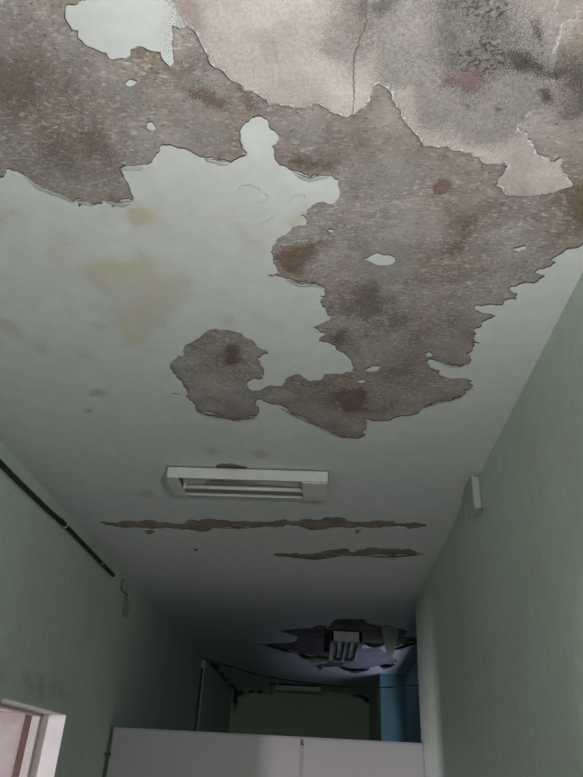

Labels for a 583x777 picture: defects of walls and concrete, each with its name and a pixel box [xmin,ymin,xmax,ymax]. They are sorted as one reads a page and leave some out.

crack [352,0,367,115]
damp [164,0,583,200]
peeling [0,0,583,439]
peeling [100,517,427,534]
peeling [274,547,425,561]
peeling [259,619,417,674]